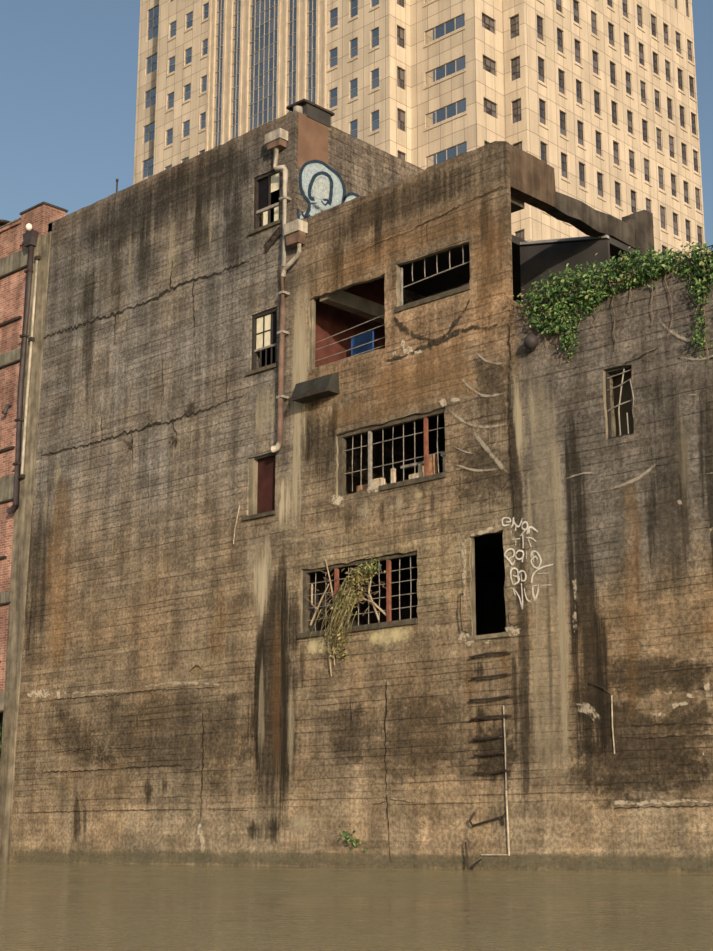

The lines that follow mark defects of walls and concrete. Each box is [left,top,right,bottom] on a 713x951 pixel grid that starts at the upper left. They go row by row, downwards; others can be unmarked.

crack [43,261,249,372]
spalling [387,300,497,362]
crack [41,358,244,527]
leakage [254,540,268,620]
spalling [589,682,615,754]
spalling [614,799,713,809]